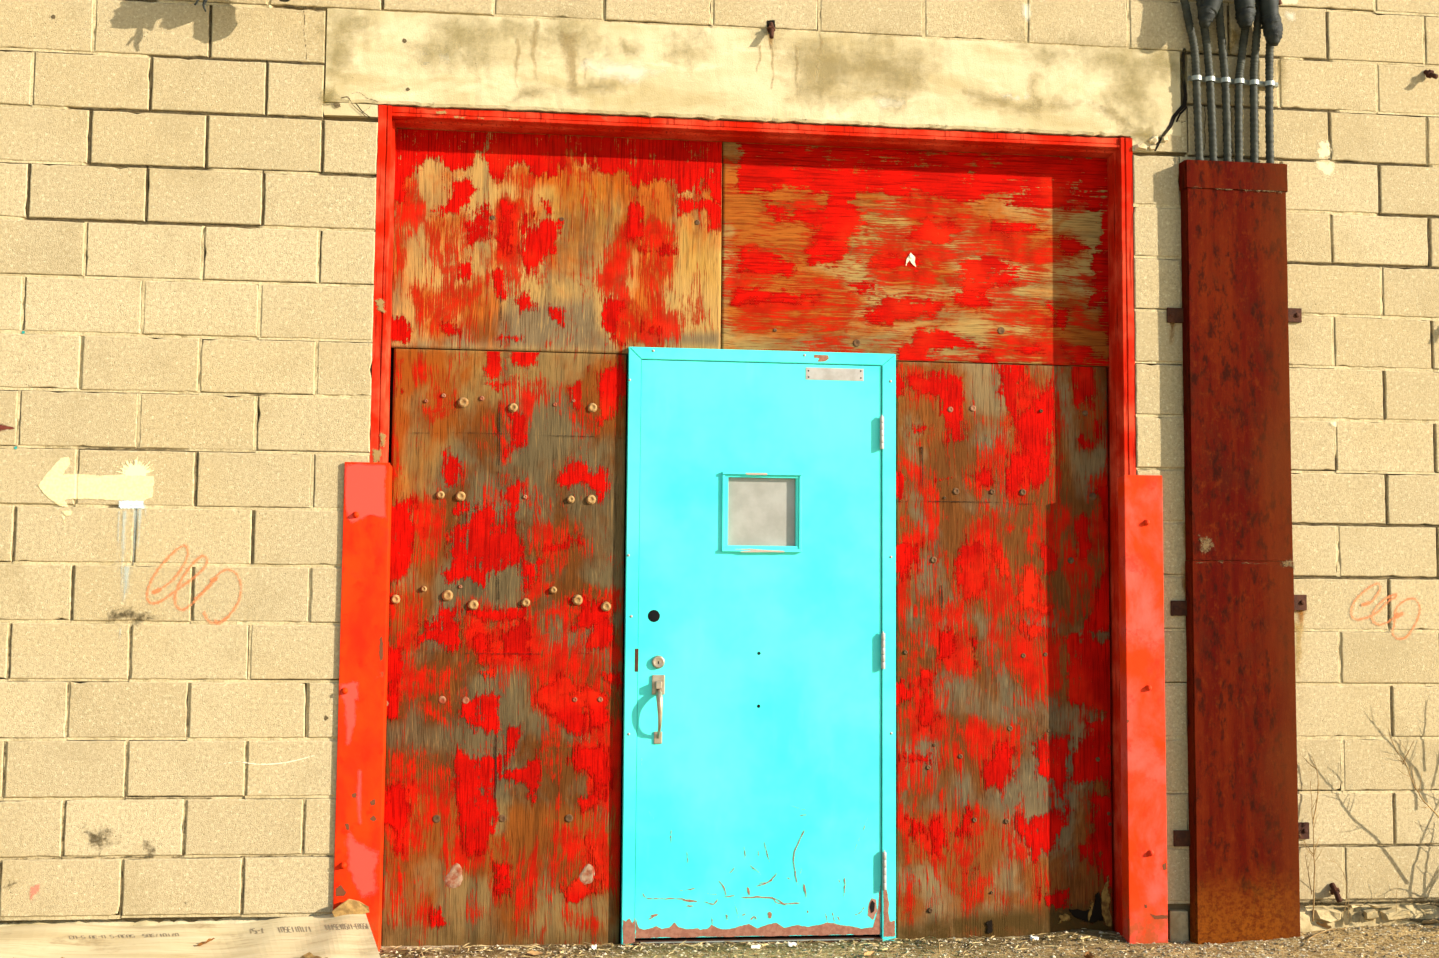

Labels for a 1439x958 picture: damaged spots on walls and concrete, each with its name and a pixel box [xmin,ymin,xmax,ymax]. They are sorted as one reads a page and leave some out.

peeling [375,299,413,347]
peeling [394,111,1109,507]
peeling [1072,485,1108,561]
peeling [896,542,928,587]
peeling [379,445,622,908]
peeling [896,626,982,733]
peeling [953,534,1129,889]
peeling [896,751,932,766]
peeling [352,780,419,858]
peeling [905,804,973,860]
peeling [430,902,450,934]
peeling [1037,886,1072,910]